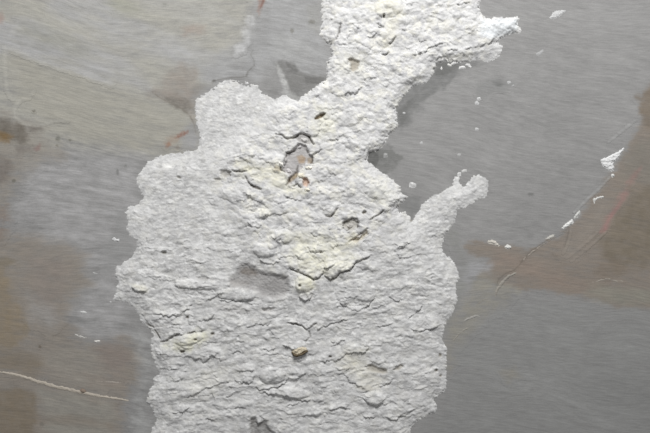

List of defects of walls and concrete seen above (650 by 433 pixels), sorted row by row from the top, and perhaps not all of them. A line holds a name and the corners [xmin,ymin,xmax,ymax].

spalling [272,132,315,188]
crack [274,132,323,189]
crack [231,169,262,191]
damp [98,0,521,433]
crack [325,207,385,244]
crack [289,257,368,282]
damp [415,79,650,433]
crack [145,321,197,343]
crack [287,322,318,343]